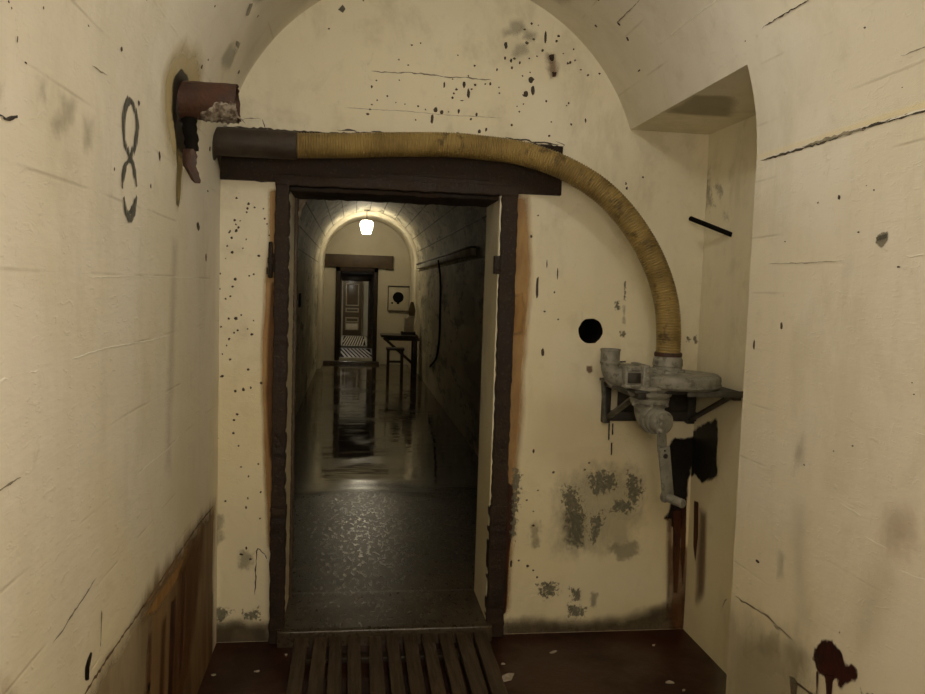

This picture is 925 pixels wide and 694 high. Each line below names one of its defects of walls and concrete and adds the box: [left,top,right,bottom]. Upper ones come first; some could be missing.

crack [765,0,808,26]
corrosion [166,55,199,198]
crack [764,109,925,160]
leakage [503,501,687,634]
leakage [561,469,643,549]
corrosion [693,501,705,597]
leakage [96,601,151,694]